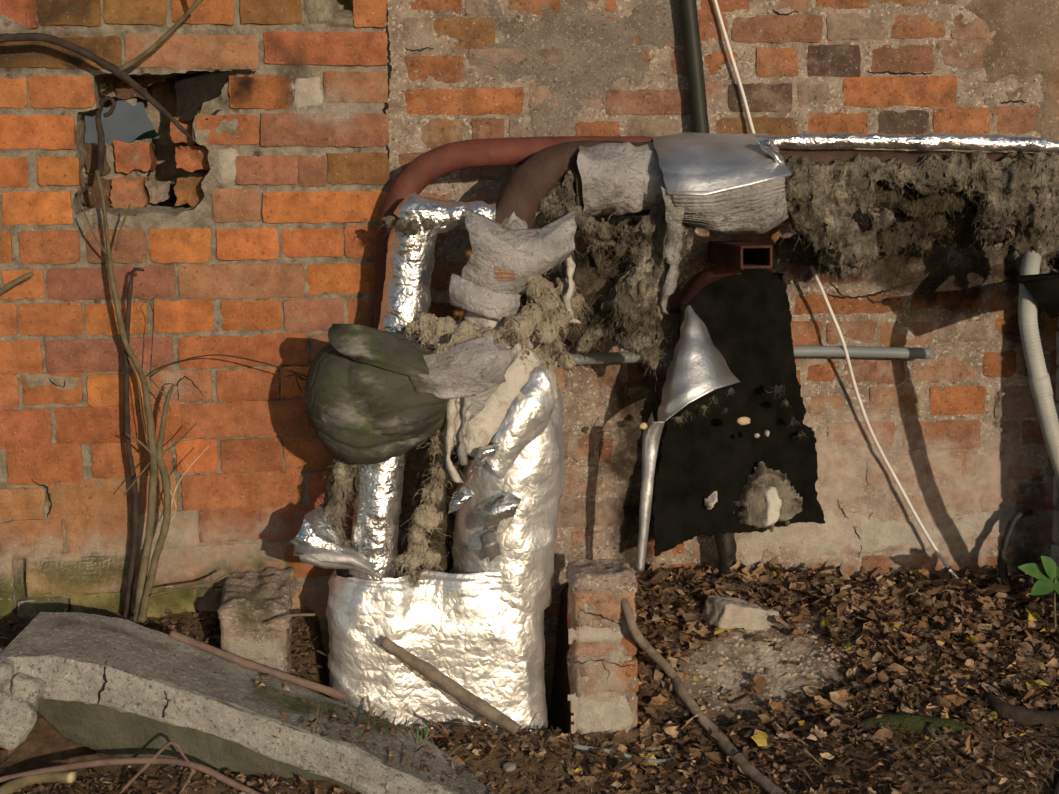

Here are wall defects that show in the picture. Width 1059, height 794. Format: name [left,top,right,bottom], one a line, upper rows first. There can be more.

spalling [73,70,256,219]
damp [804,242,1022,347]